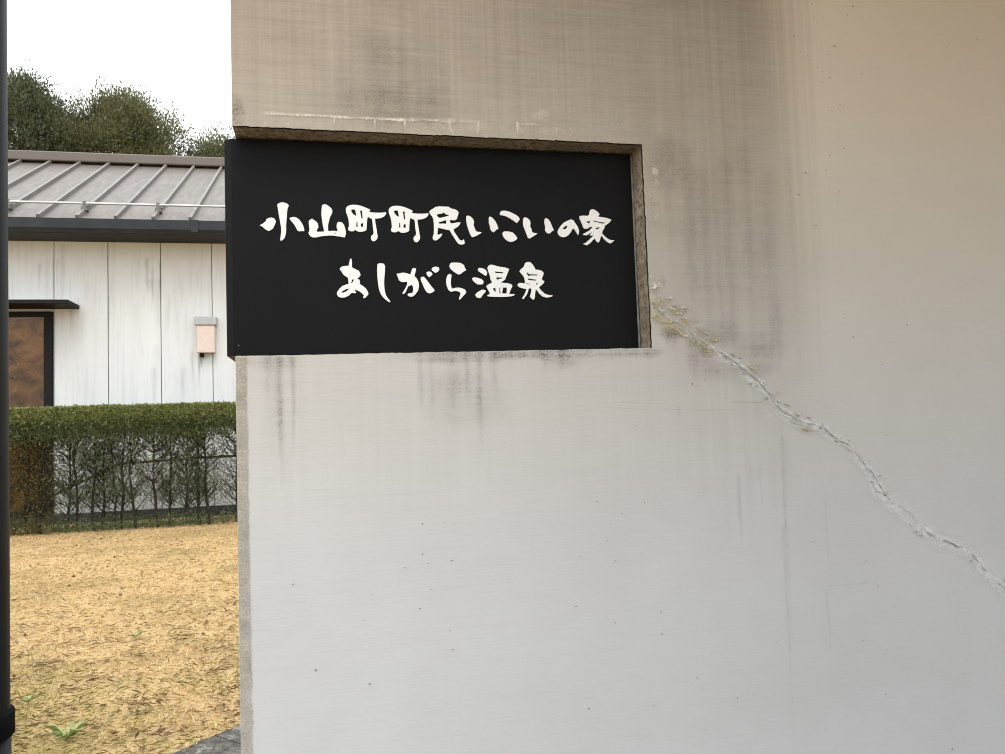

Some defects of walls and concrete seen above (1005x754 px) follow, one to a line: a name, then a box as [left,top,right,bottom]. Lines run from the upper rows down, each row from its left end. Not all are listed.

damp [264,112,462,131]
crack [652,284,1005,593]